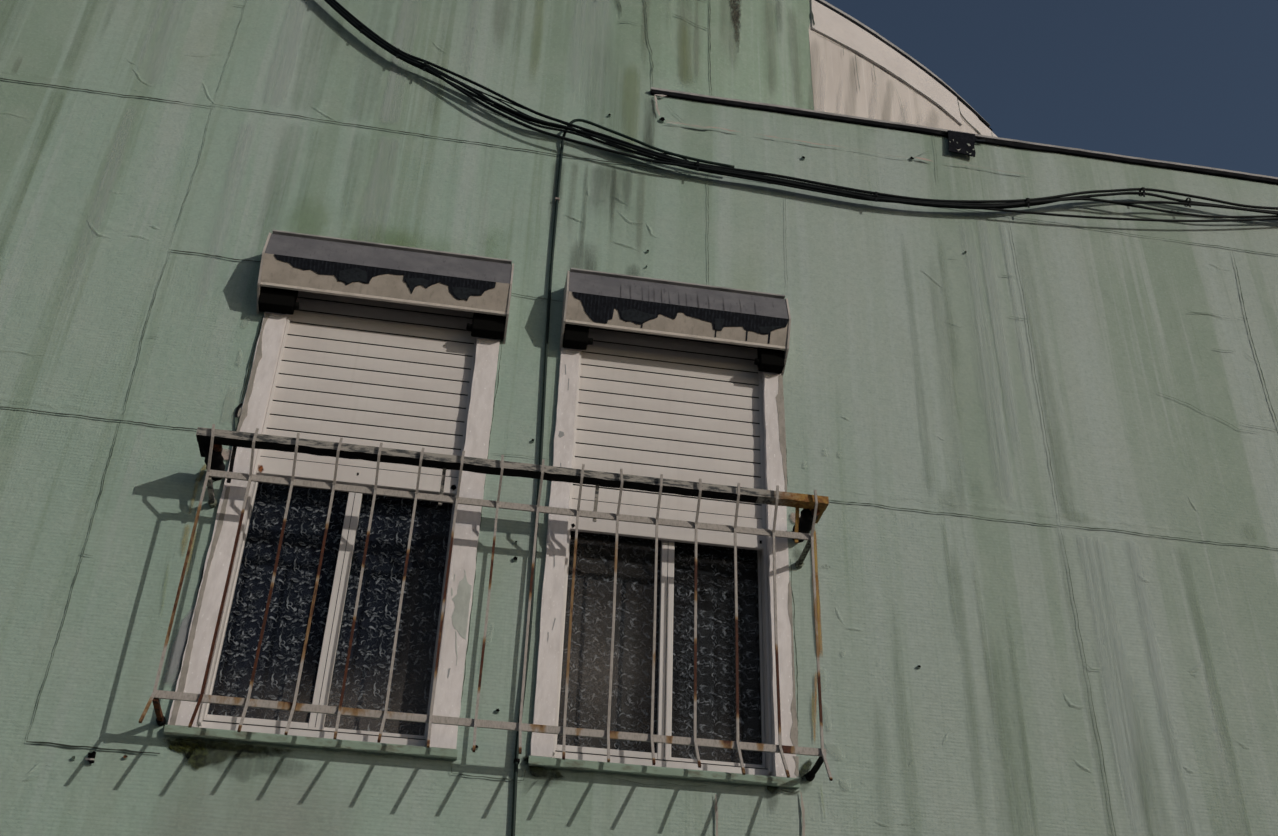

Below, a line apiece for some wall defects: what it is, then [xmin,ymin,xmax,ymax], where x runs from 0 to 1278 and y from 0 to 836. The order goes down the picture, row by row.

water stain [730,0,741,41]
peeling [274,254,496,301]
peeling [572,292,789,343]
corrosion [814,530,822,654]
peeling [447,570,471,678]
water stain [168,738,290,769]